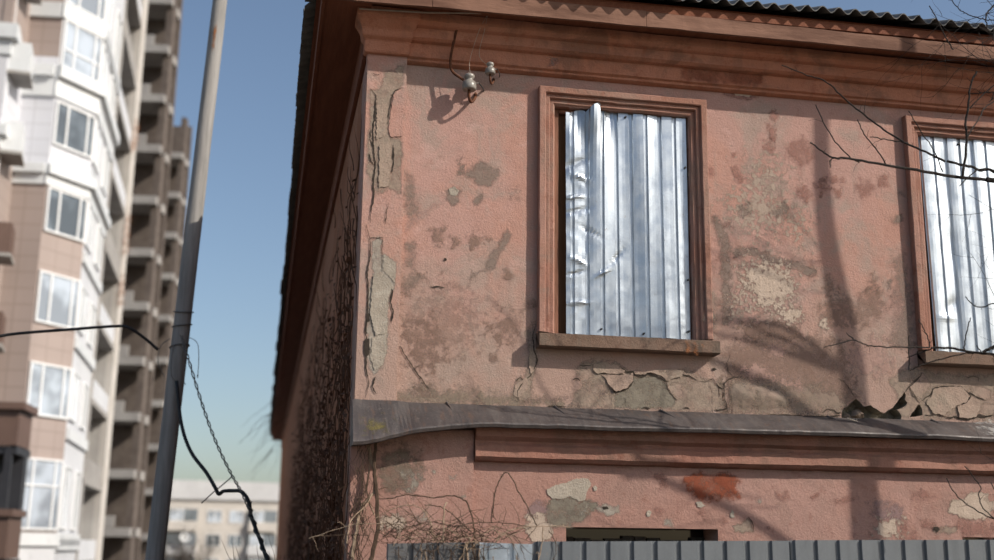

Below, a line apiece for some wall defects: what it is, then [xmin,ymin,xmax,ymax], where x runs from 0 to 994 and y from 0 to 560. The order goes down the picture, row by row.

peeling [366,66,404,194]
peeling [447,159,499,206]
peeling [367,237,396,374]
peeling [705,215,831,339]
crack [400,346,431,392]
crack [515,325,538,400]
crack [573,356,736,411]
crack [771,379,855,417]
spalling [841,332,994,422]
crack [905,373,993,421]
peeling [524,478,620,542]
spalling [922,492,994,538]